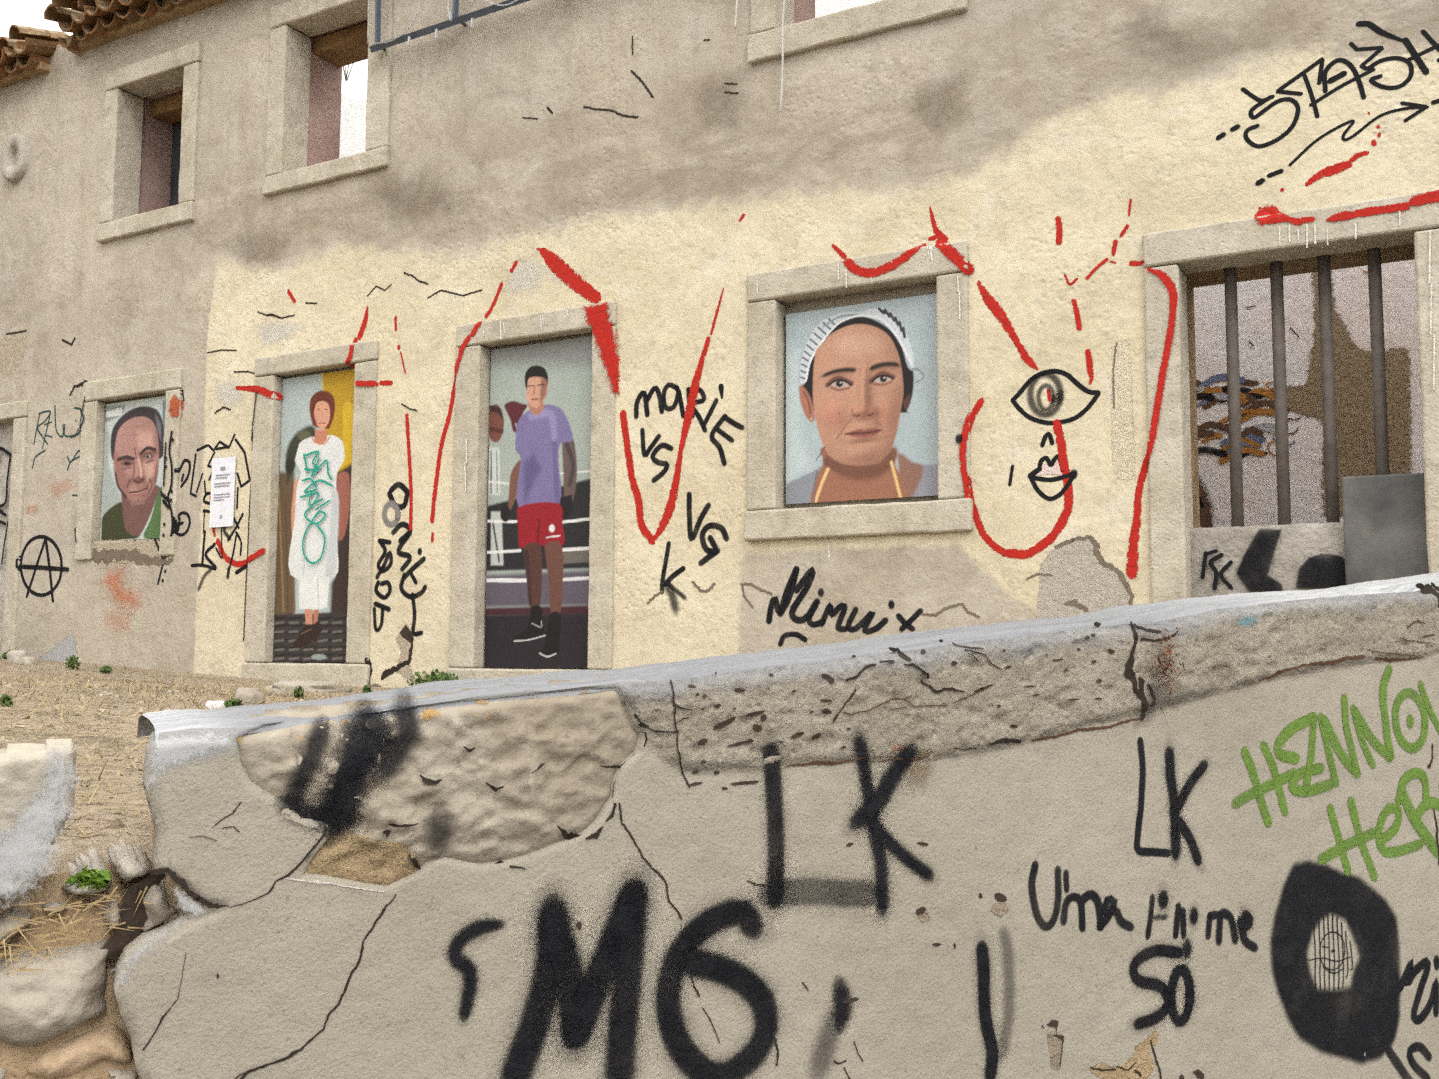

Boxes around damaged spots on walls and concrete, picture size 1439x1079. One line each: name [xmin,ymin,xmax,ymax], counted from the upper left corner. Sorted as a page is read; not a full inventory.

spalling [147,624,638,892]
crack [600,680,692,920]
crack [833,603,1002,722]
crack [786,621,1176,767]
spalling [1035,535,1134,701]
crack [1259,582,1439,681]
crack [235,894,397,1079]
crack [689,974,720,1043]
spalling [1089,1029,1159,1079]